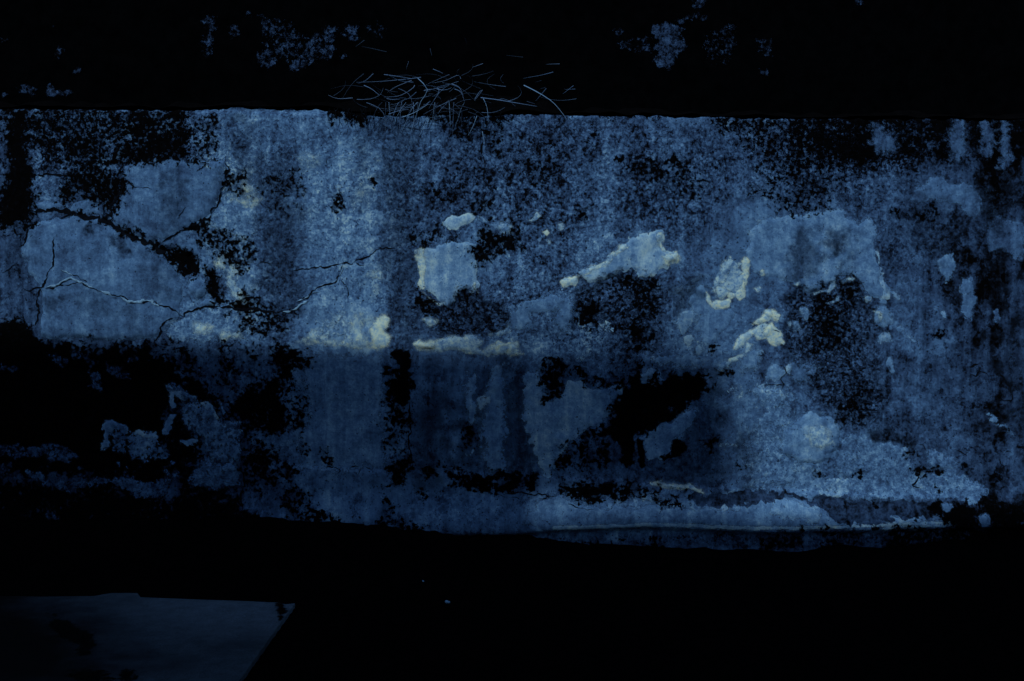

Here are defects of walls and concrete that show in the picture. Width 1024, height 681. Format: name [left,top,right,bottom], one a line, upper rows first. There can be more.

crack [0,143,392,342]
damp [0,218,809,536]
peeling [462,363,623,479]
spalling [407,197,735,387]
peeling [524,208,990,532]
damp [813,277,855,304]
peeling [987,412,1014,435]